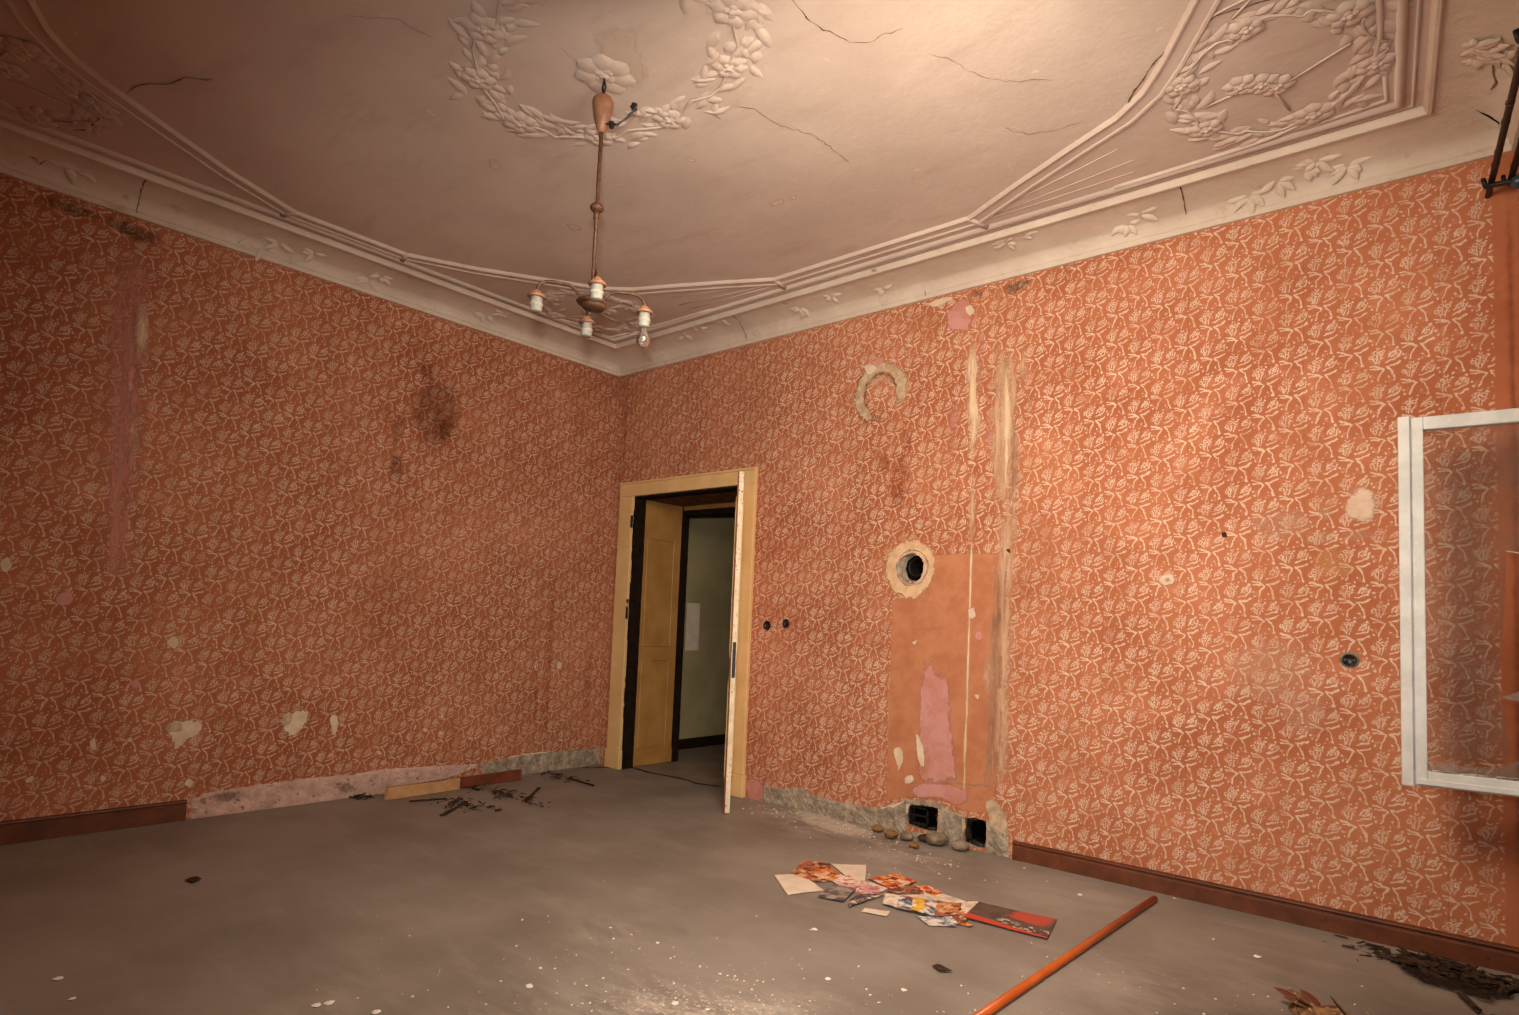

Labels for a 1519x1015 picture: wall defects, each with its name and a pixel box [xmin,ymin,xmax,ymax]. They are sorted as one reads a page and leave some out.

crack [793,1,901,43]
crack [126,77,211,95]
crack [930,54,1052,82]
peeling [1346,488,1375,522]
spalling [885,539,935,599]
peeling [968,608,982,641]
peeling [165,719,202,749]
flaking render [184,710,601,819]
peeling [746,661,968,845]
flaking render [985,798,1009,857]